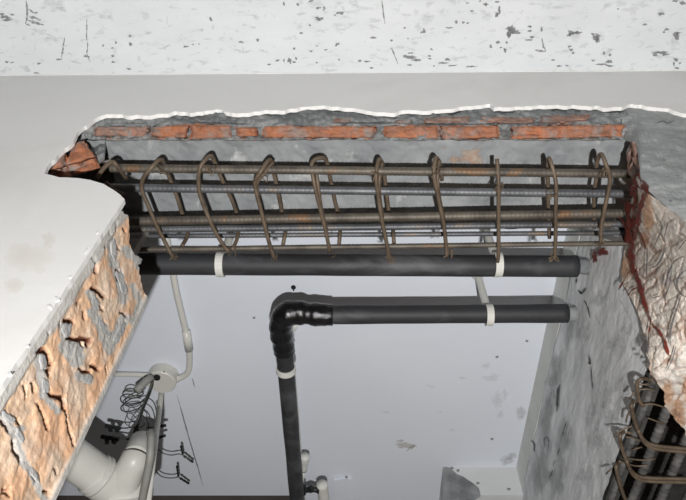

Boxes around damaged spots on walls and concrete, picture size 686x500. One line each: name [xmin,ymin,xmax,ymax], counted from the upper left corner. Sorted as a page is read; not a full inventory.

spalling [0,108,686,500]
corrosion [592,247,608,263]
corrosion [618,173,669,356]